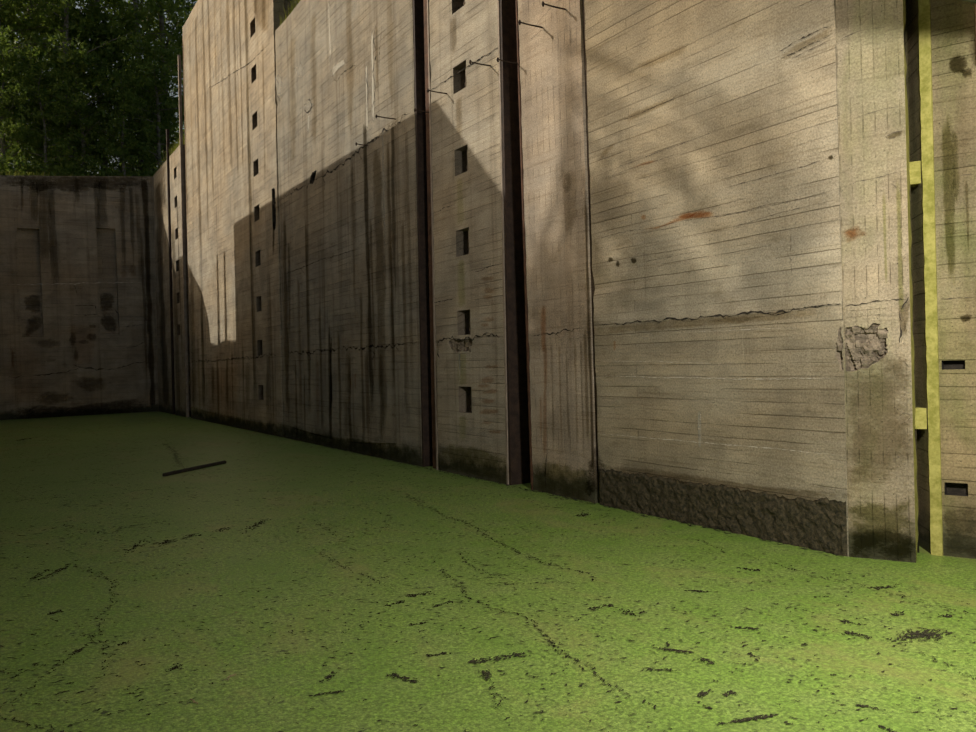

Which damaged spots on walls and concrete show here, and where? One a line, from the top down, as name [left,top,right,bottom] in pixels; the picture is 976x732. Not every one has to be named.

water stain [10,176,155,406]
crack [189,333,503,366]
crack [534,298,905,336]
spalling [831,297,909,377]